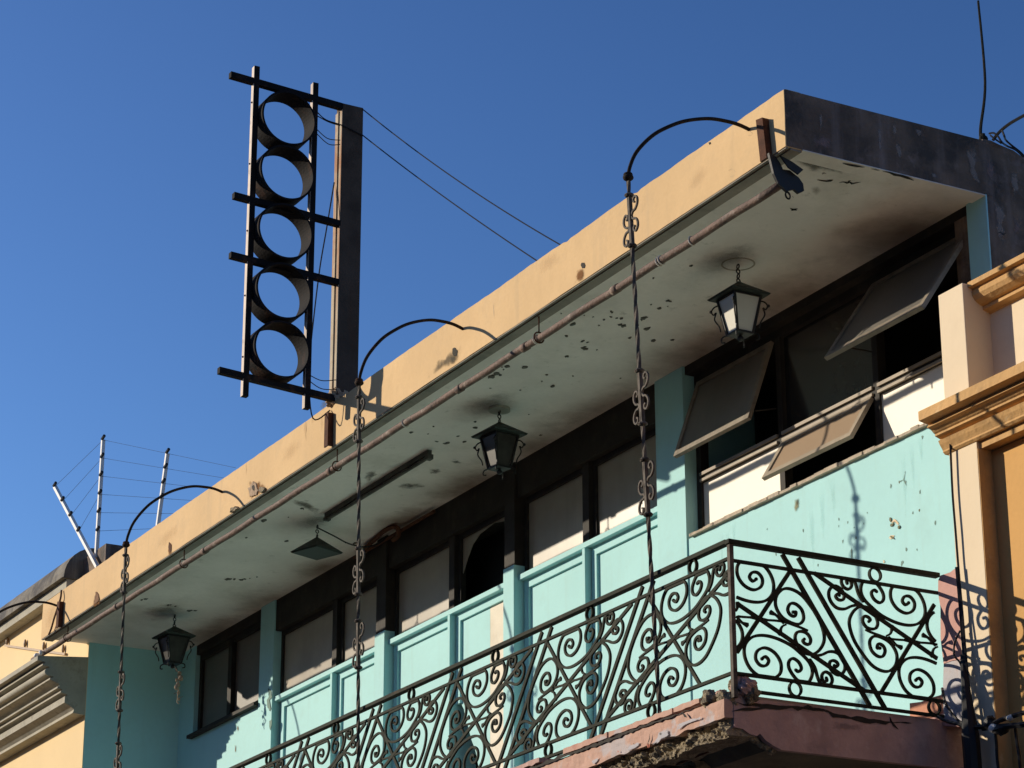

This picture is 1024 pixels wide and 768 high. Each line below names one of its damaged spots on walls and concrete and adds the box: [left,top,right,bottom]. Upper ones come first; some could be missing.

spalling [592,676,776,768]